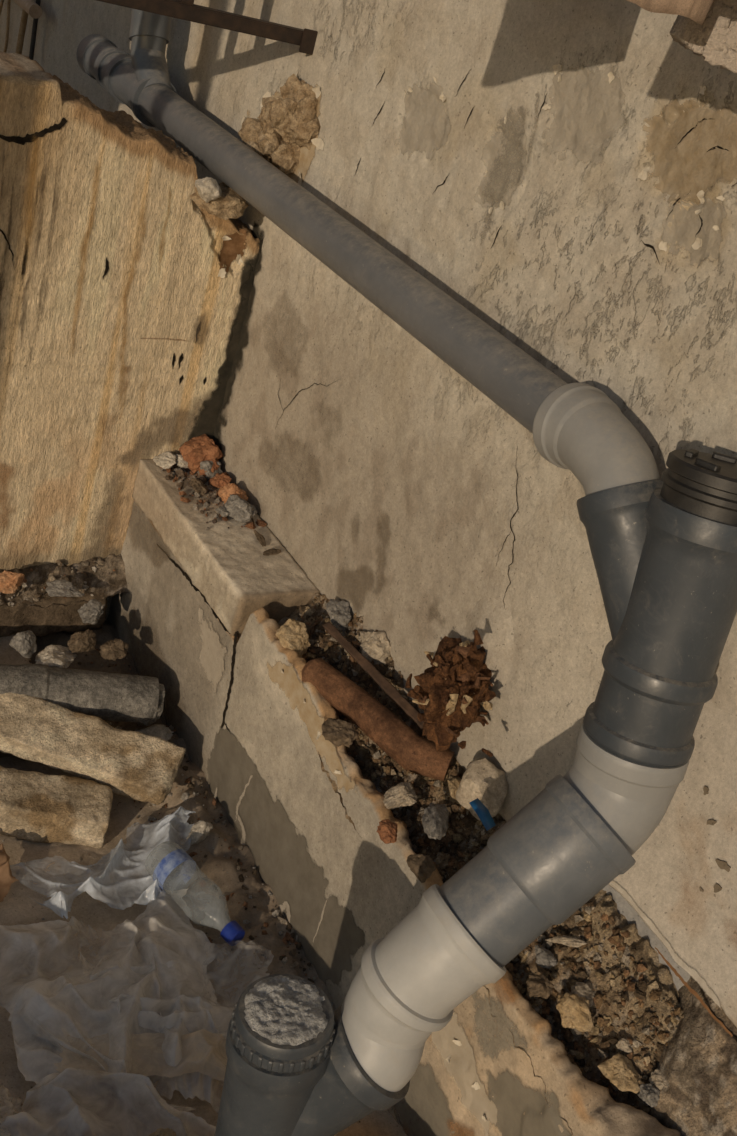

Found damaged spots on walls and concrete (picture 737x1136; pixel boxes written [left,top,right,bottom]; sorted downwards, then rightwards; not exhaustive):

crack [0,118,67,145]
spalling [190,177,249,278]
peeling [638,86,737,265]
damp [128,222,264,462]
crack [497,454,518,607]
crack [157,544,238,732]
damp [198,608,227,693]
peeling [431,1012,498,1136]